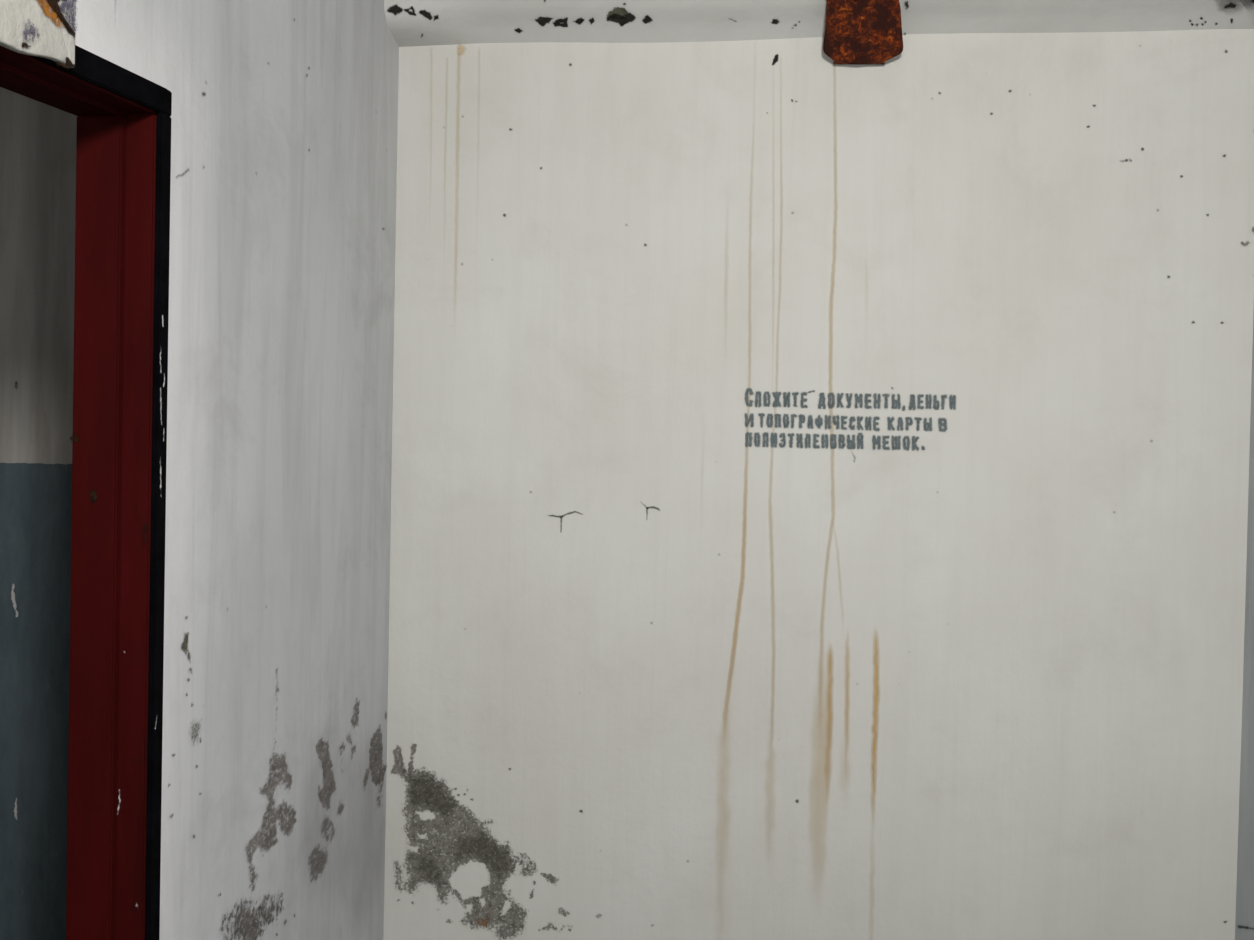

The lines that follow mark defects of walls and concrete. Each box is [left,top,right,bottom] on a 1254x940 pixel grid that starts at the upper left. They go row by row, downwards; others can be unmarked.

peeling [391,744,558,940]